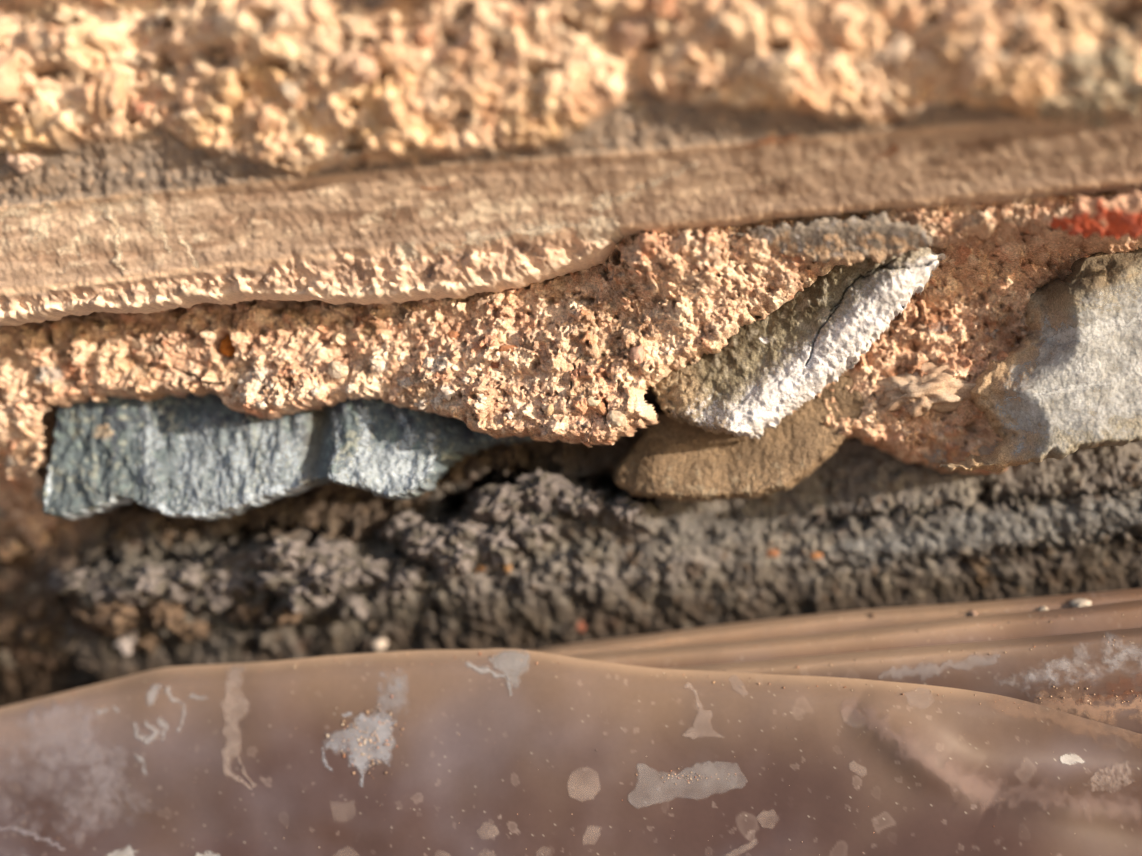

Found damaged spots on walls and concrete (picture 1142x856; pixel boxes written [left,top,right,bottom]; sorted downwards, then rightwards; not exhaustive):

damp [1040,693,1142,721]